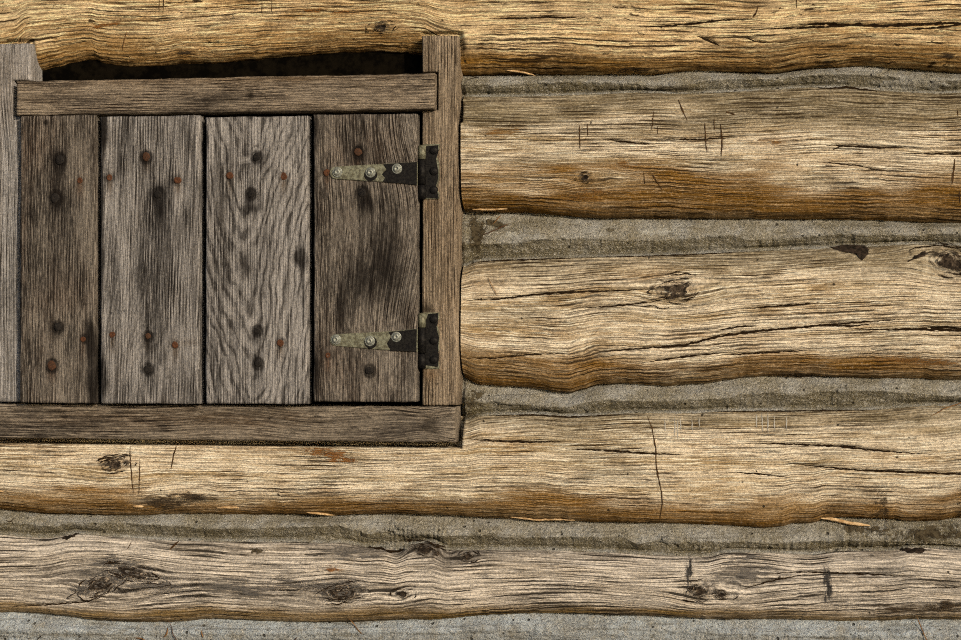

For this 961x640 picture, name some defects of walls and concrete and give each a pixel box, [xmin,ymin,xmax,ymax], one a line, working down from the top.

crack [594,302,961,363]
rust [301,442,358,462]